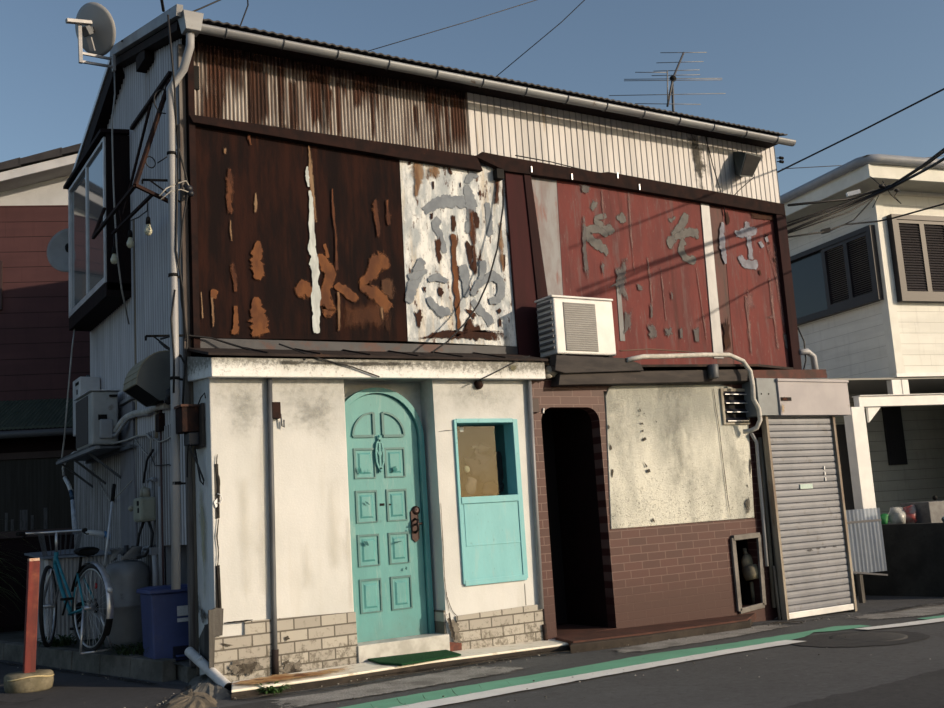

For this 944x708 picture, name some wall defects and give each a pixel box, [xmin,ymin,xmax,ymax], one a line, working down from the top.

corrosion [195,42,467,150]
corrosion [408,162,461,197]
peeling [345,302,391,329]
corrosion [414,210,507,341]